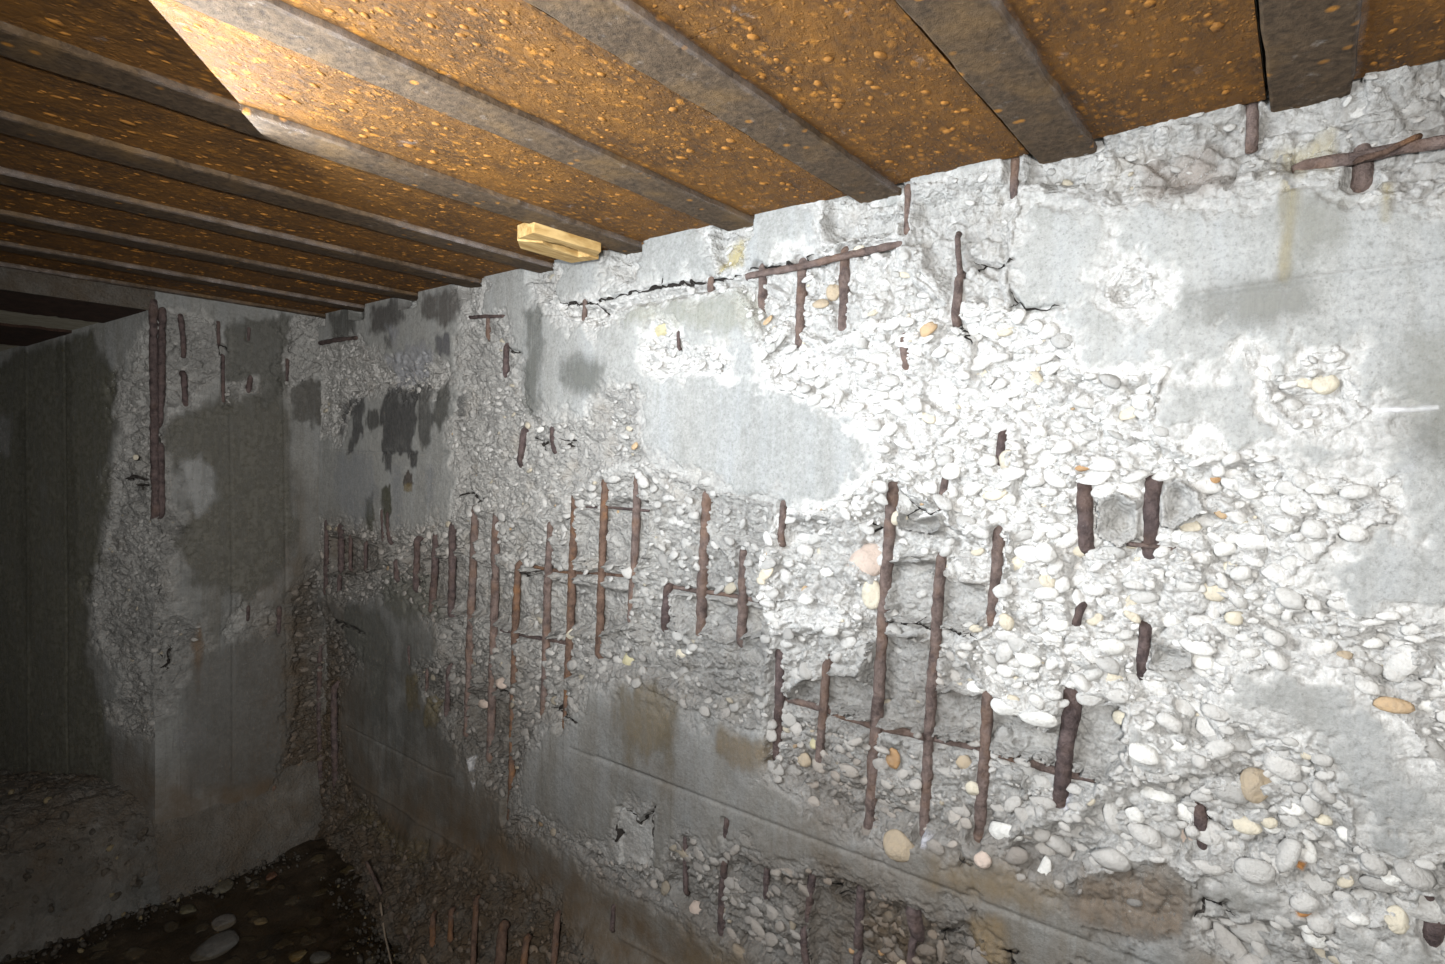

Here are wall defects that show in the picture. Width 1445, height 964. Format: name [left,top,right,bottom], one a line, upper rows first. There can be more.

spalling [91,299,258,734]
damp [329,289,466,531]
crack [554,254,828,315]
spalling [276,59,1445,964]